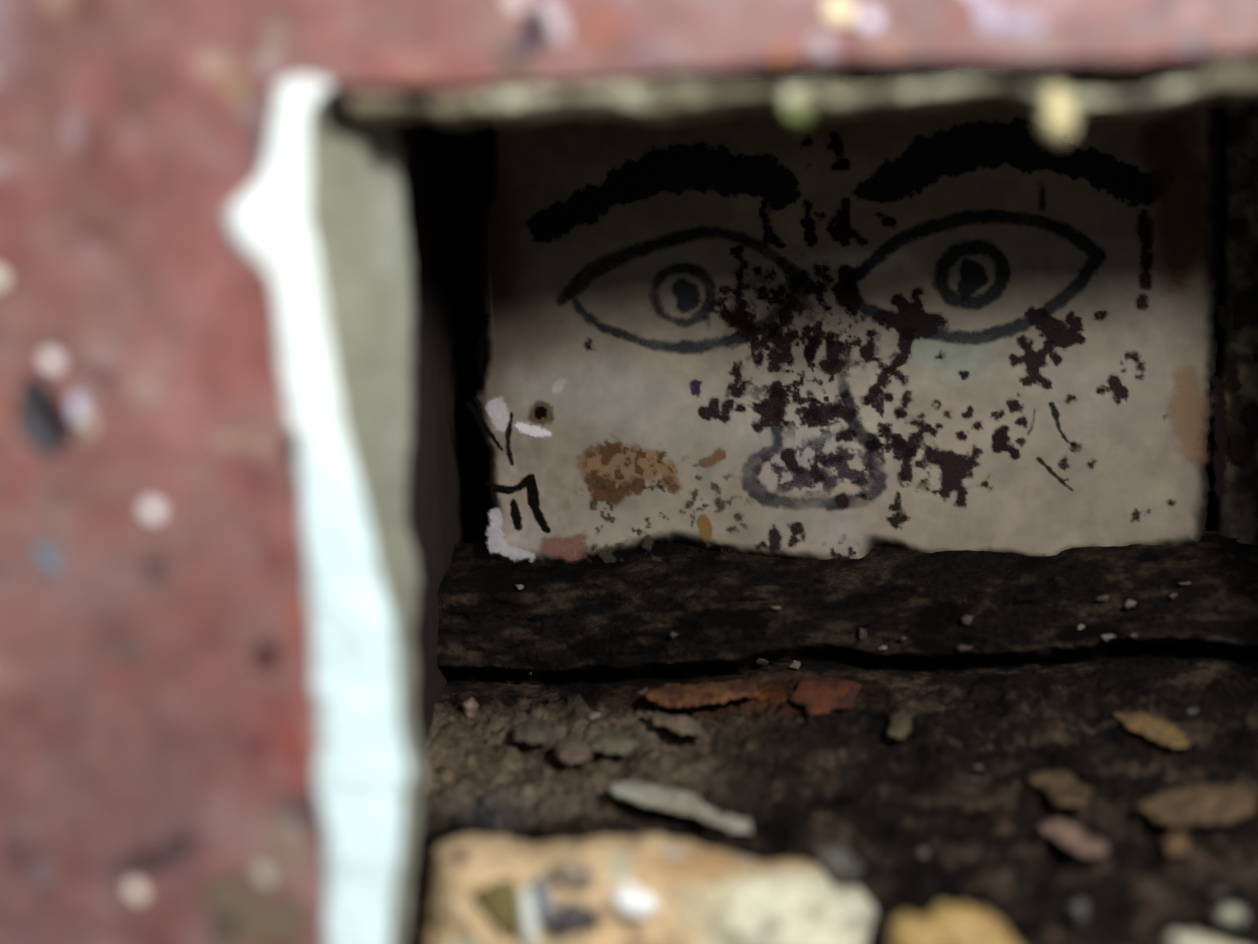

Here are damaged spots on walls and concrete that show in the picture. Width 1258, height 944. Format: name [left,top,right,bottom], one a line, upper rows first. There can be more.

flaking render [487,398,554,437]
corrosion [580,442,679,504]
flaking render [489,509,534,559]